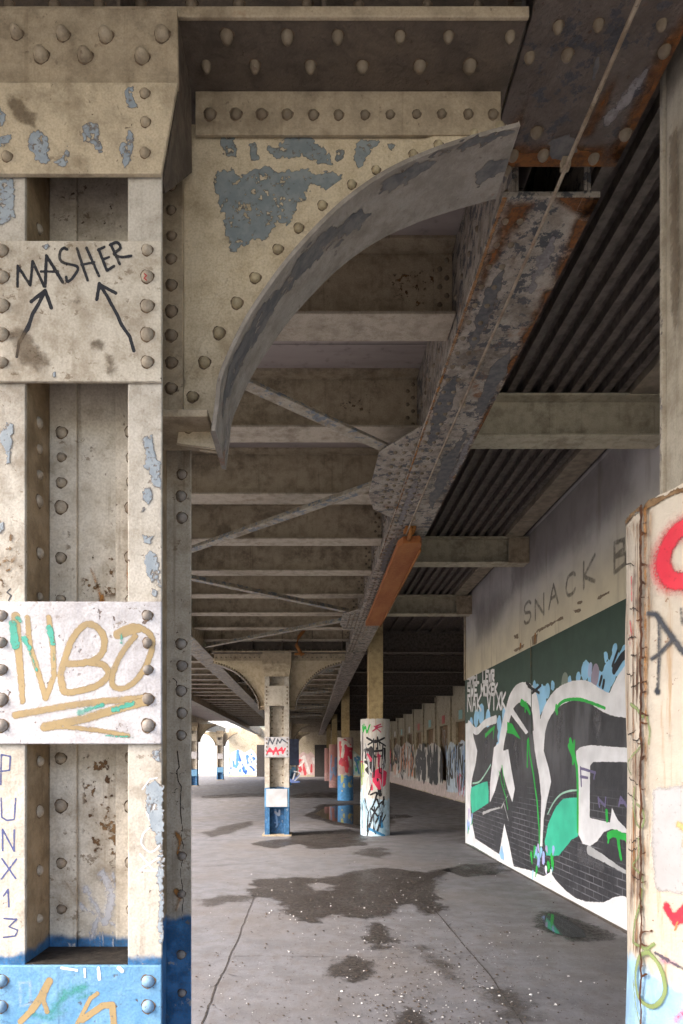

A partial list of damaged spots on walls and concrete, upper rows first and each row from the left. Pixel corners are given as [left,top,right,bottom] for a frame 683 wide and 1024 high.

peeling [28,129,70,167]
peeling [213,138,395,252]
rust [508,20,683,167]
rust [504,197,599,381]
rust [380,197,531,557]
peeling [141,434,162,512]
rust [84,756,116,858]
peeling [145,779,165,944]
crack [172,745,274,920]
crack [201,898,256,1024]
water stain [203,792,513,983]
water stain [534,912,615,942]